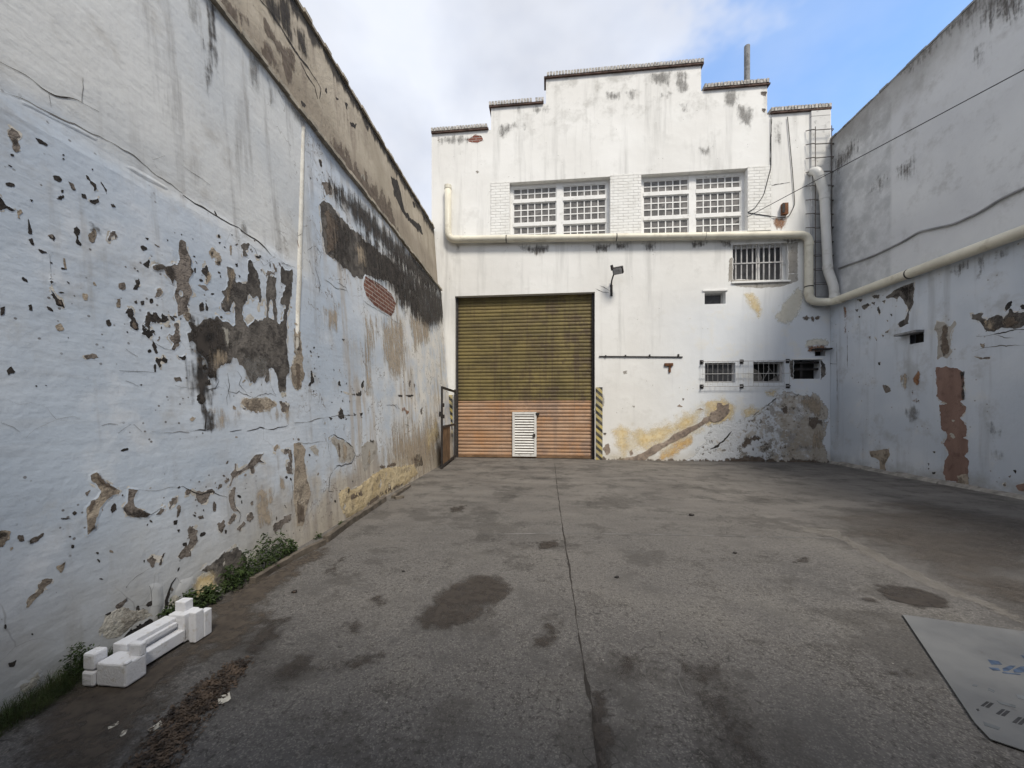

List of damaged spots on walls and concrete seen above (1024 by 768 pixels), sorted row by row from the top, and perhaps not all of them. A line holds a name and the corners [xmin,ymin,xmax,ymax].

crack [0,62,396,322]
flaking render [116,232,320,414]
flaking render [310,155,405,318]
damp [328,137,443,395]
damp [603,400,756,461]
flaking render [623,360,829,463]
flaking render [855,282,915,341]
flaking render [928,320,970,485]
flaking render [970,300,1024,360]
flaking render [61,434,429,597]
crack [554,463,602,768]